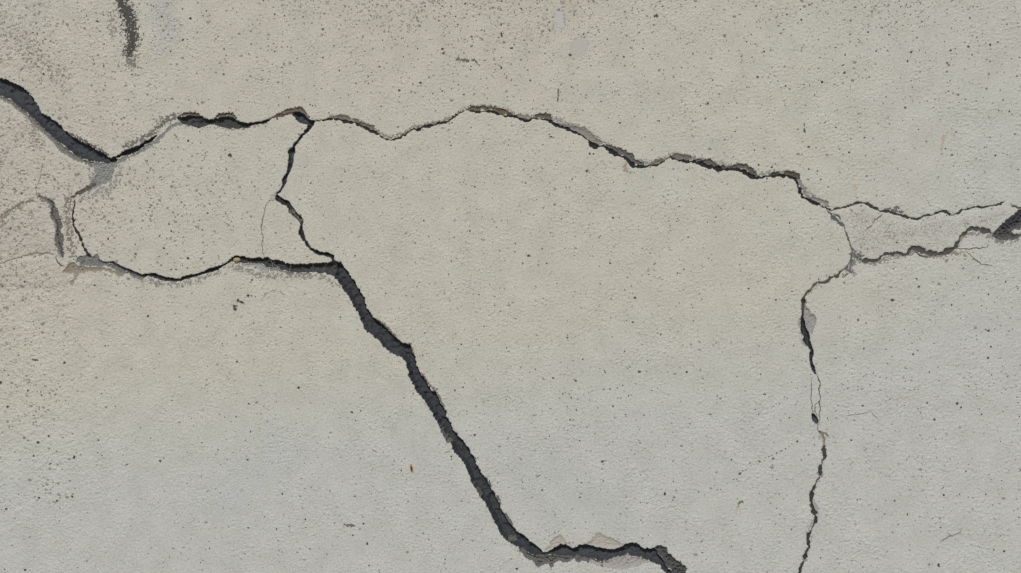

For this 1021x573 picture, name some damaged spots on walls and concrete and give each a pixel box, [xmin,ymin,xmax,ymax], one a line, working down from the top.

crack [0,78,157,164]
crack [0,168,63,266]
crack [71,110,1021,573]